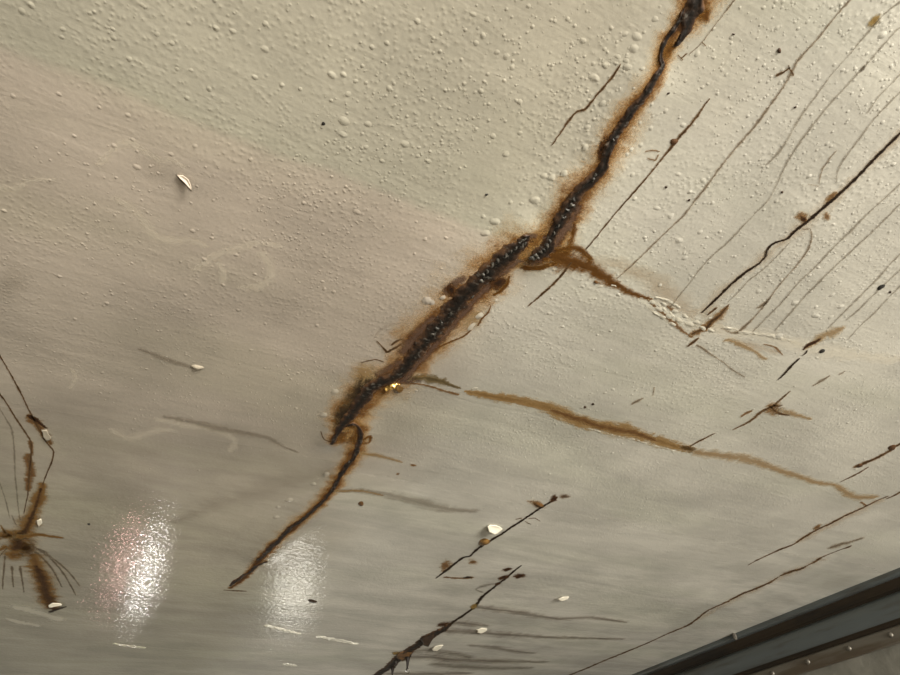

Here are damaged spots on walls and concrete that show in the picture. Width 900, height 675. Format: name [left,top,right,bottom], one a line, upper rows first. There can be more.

crack [868,15,880,27]
crack [226,0,851,592]
peeling [638,297,806,347]
crack [687,133,900,377]
crack [0,355,55,512]
corrosion [0,482,80,613]
crack [374,495,568,675]
crack [570,492,900,675]